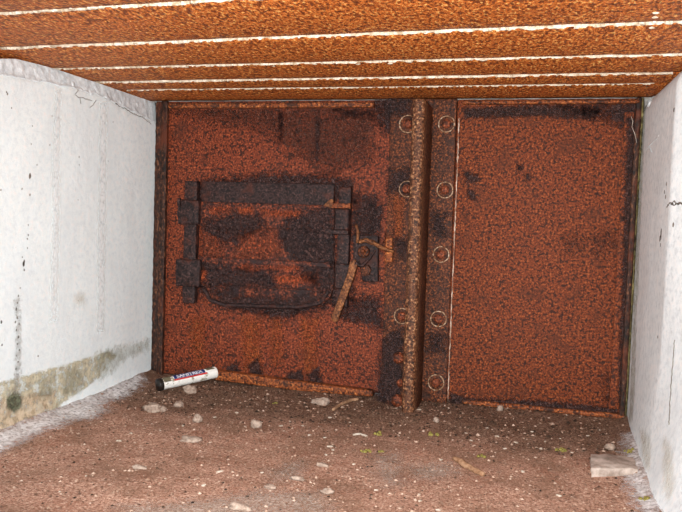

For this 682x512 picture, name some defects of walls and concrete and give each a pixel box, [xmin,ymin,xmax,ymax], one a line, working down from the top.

rust [335,98,413,132]
rust [200,171,382,241]
rust [386,167,410,195]
rust [202,207,336,284]
rust [450,104,642,413]
rust [227,286,336,322]
leakage [0,352,147,452]
rust [248,358,262,375]
rust [286,368,322,383]
rust [341,279,404,406]